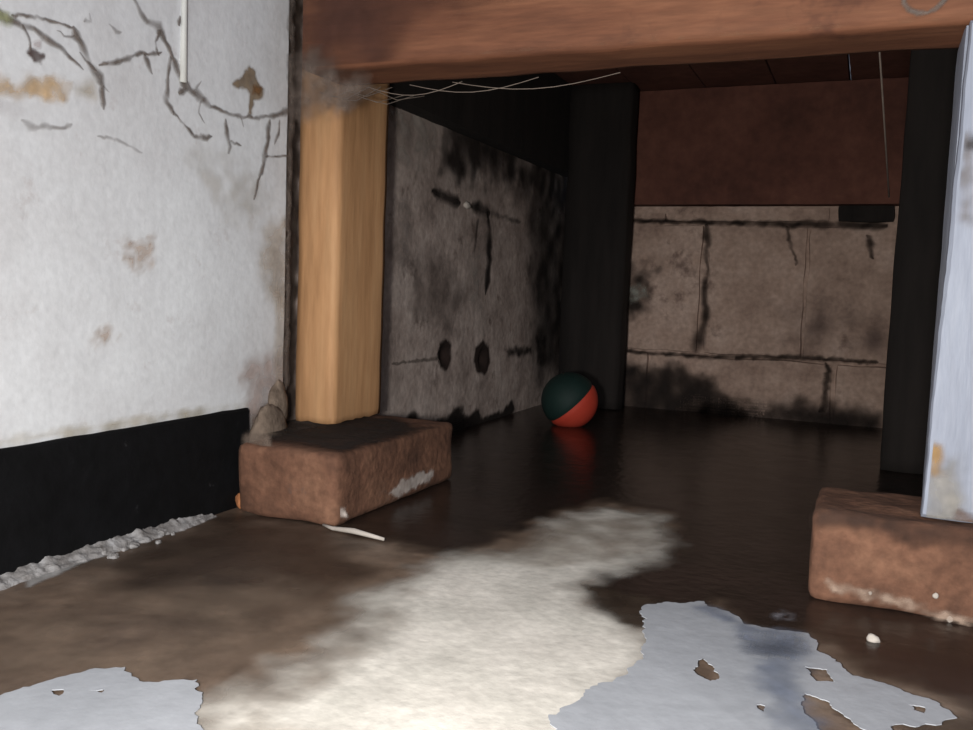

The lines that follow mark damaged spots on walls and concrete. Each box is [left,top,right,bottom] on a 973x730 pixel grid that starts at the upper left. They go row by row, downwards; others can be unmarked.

corrosion [0,78,65,101]
crack [0,11,289,199]
corrosion [233,67,263,114]
damp [245,0,401,428]
crack [431,189,491,295]
damp [444,129,568,375]
crack [627,219,888,412]
damp [118,516,367,596]
damp [341,364,973,697]
corrosion [932,446,960,519]